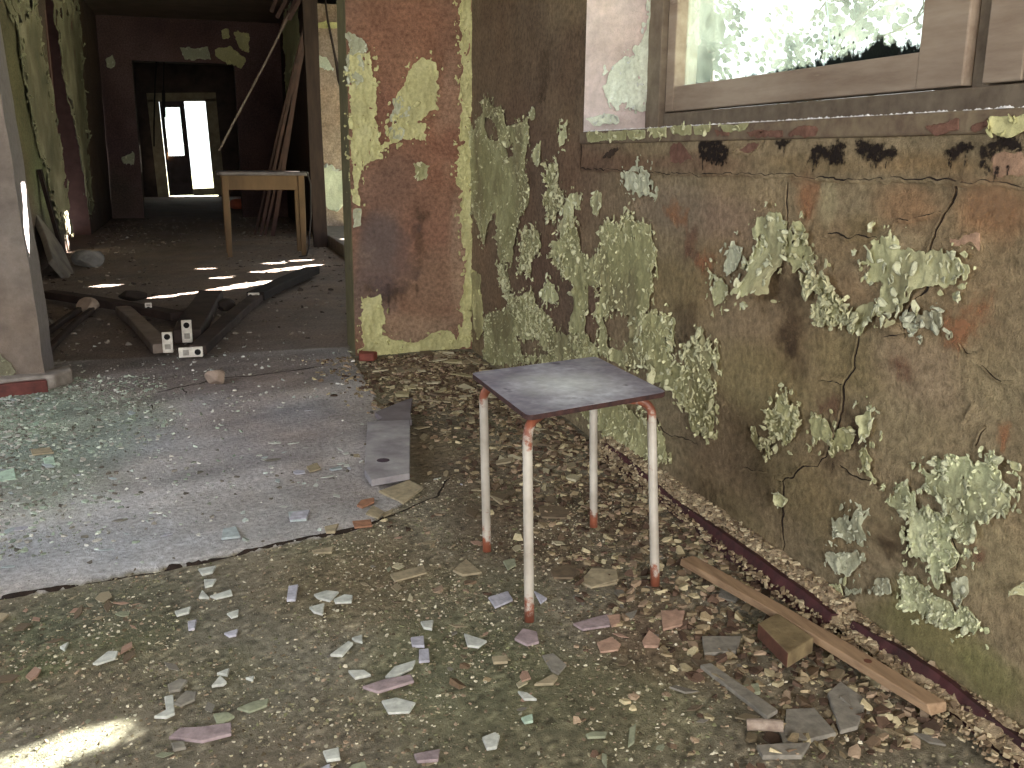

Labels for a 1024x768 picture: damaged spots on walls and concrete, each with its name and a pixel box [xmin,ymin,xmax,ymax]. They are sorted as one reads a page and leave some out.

peeling [4,0,95,241]
peeling [318,20,443,228]
peeling [356,0,723,445]
mould [698,141,729,170]
crack [579,145,1024,253]
peeling [705,201,983,345]
mould [807,138,897,171]
mould [944,137,1024,179]
crack [775,286,929,551]
crack [961,401,985,446]
crack [958,343,1013,385]
peeling [750,382,1024,650]